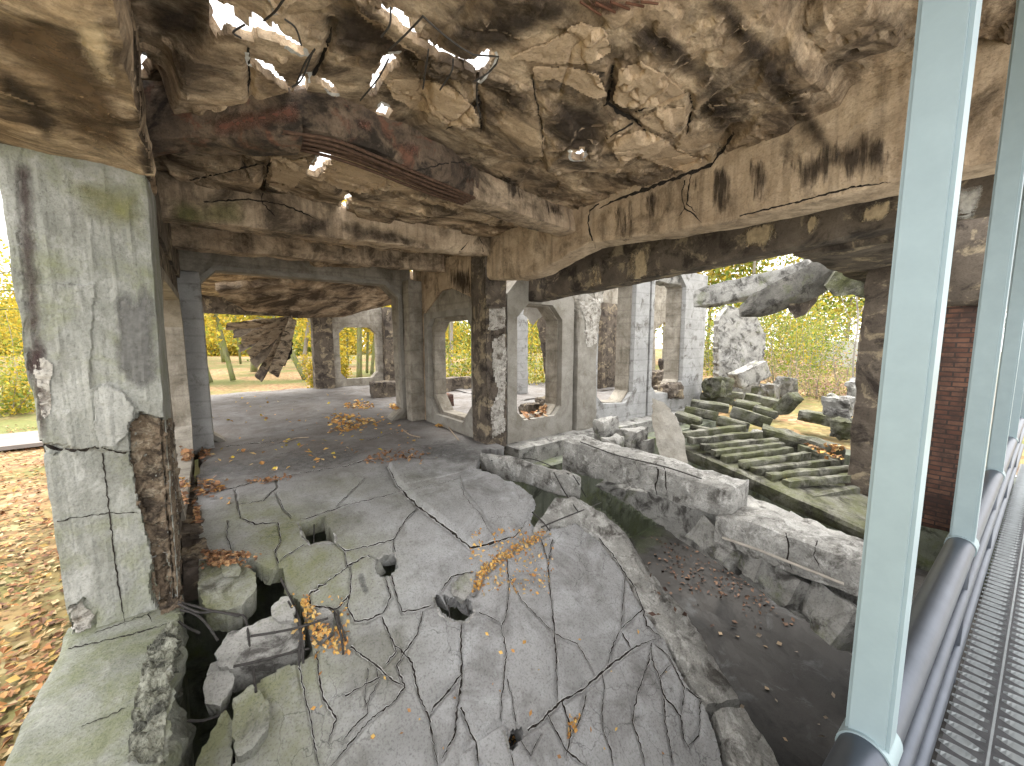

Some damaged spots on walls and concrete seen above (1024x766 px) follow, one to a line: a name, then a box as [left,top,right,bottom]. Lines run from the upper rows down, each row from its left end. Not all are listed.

flaking render [385,78,480,128]
flaking render [511,22,703,172]
leakage [716,5,888,186]
crack [587,132,735,248]
leakage [713,169,730,212]
leakage [750,161,765,196]
crack [739,182,890,217]
spalling [33,357,53,418]
spalling [488,307,507,438]
crack [44,444,167,649]
spalling [94,384,347,765]
crack [221,440,702,766]